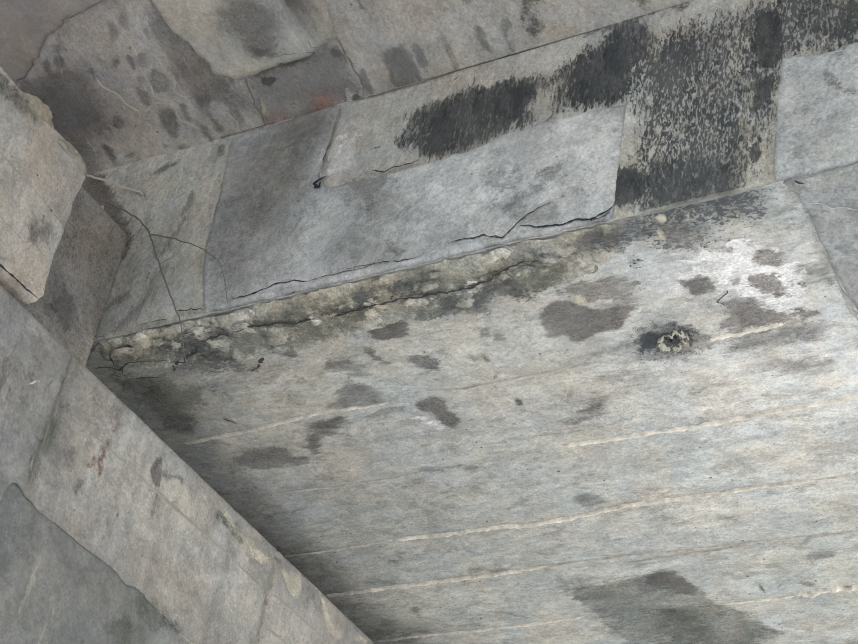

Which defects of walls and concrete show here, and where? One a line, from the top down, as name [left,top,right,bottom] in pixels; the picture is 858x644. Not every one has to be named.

leakage [384,45,428,87]
leakage [387,0,858,315]
leakage [82,174,133,247]
leakage [149,326,258,374]
crack [95,255,539,379]
leakage [408,355,439,369]
leakage [369,273,641,340]
leakage [410,397,458,429]
leakage [574,572,778,644]